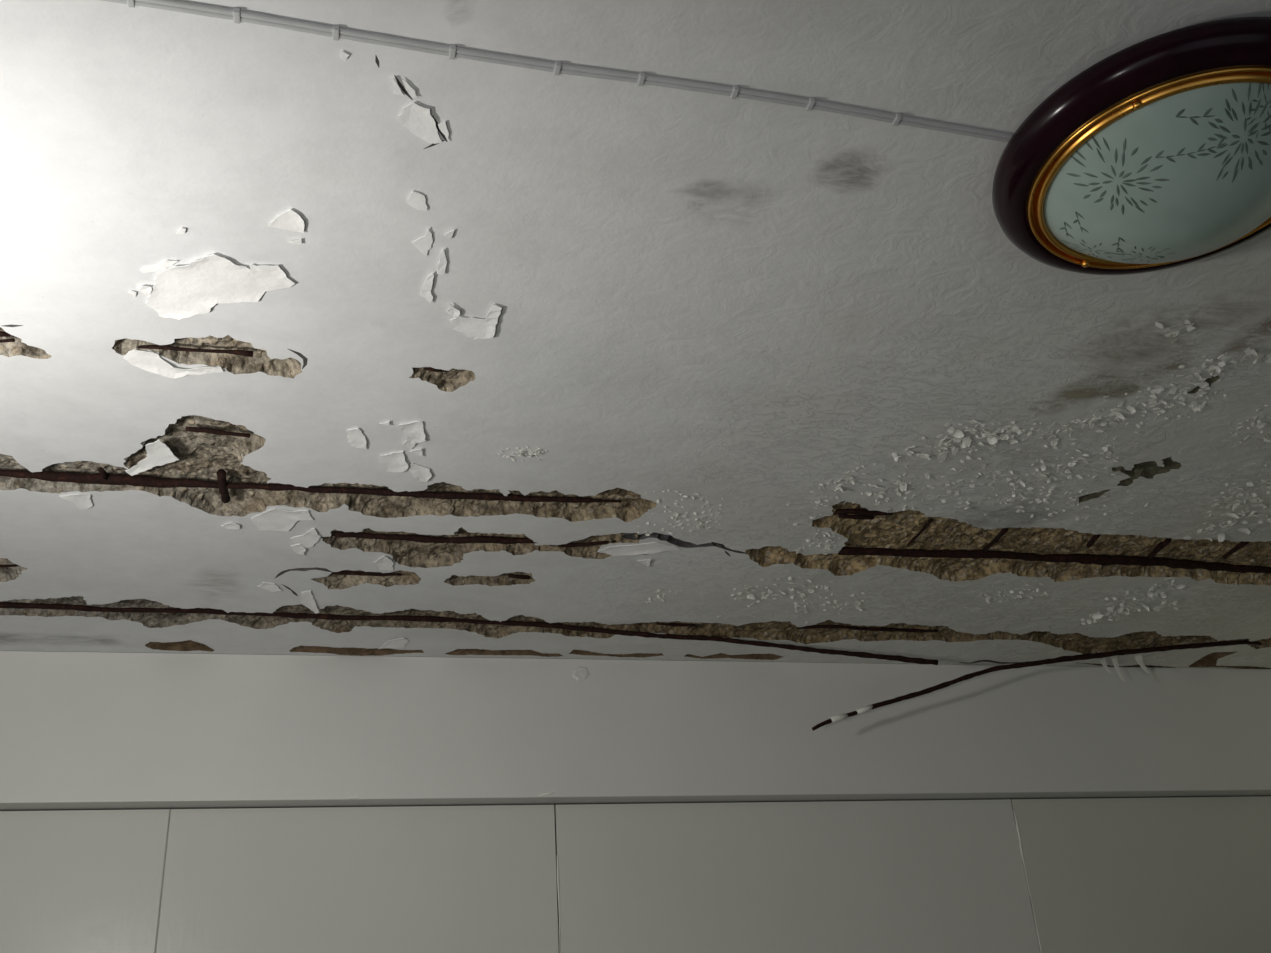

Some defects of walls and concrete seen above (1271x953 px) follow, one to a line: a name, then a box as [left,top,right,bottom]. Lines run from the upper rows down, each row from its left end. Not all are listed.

peeling [390,78,449,144]
peeling [128,254,295,320]
peeling [412,228,454,304]
spalling [0,327,52,359]
spalling [112,335,302,379]
peeling [446,303,502,340]
spalling [0,345,1271,682]
crack [959,658,1021,666]